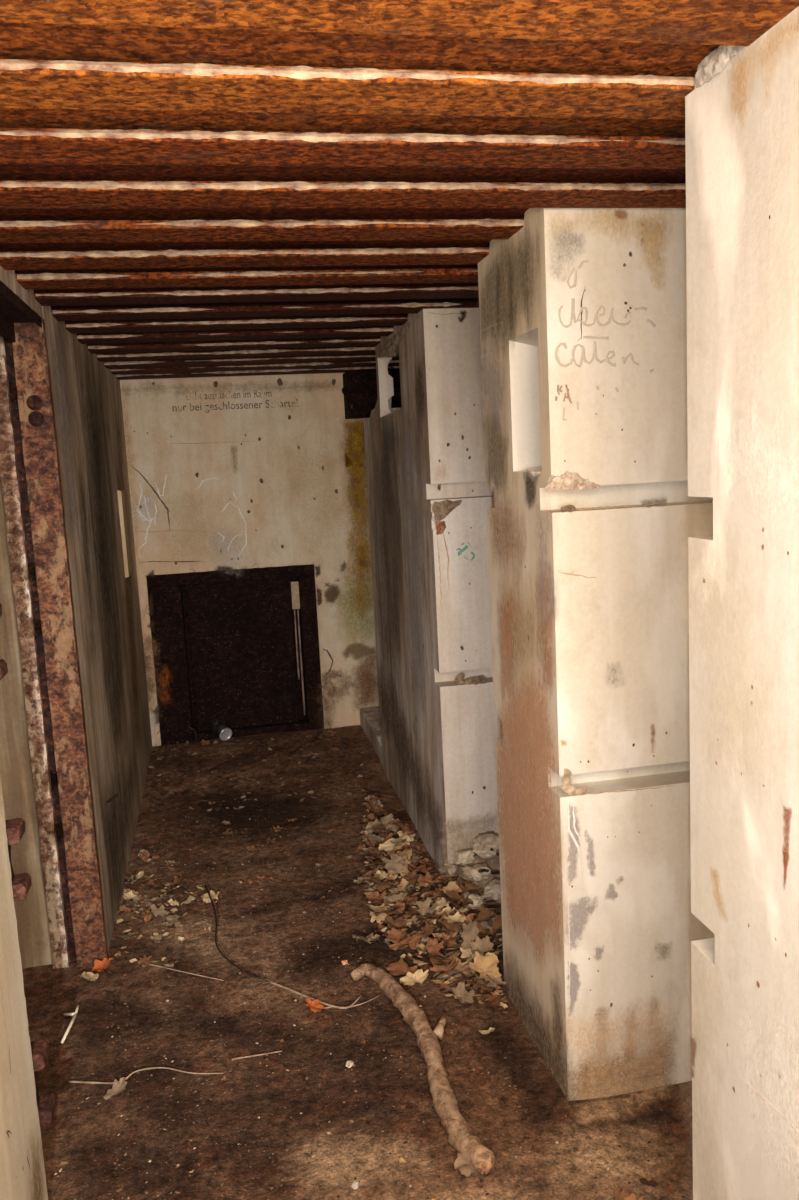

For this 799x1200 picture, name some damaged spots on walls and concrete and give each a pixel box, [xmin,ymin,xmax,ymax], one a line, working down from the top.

damp [139,218,524,228]
damp [0,241,533,377]
damp [54,342,122,727]
spalling [432,485,473,535]
damp [526,476,536,506]
spalling [544,460,600,512]
damp [322,422,493,870]
damp [568,800,587,883]
peeling [561,760,623,946]
rust [783,808,791,880]
peeling [568,948,603,1010]
damp [507,897,672,1104]